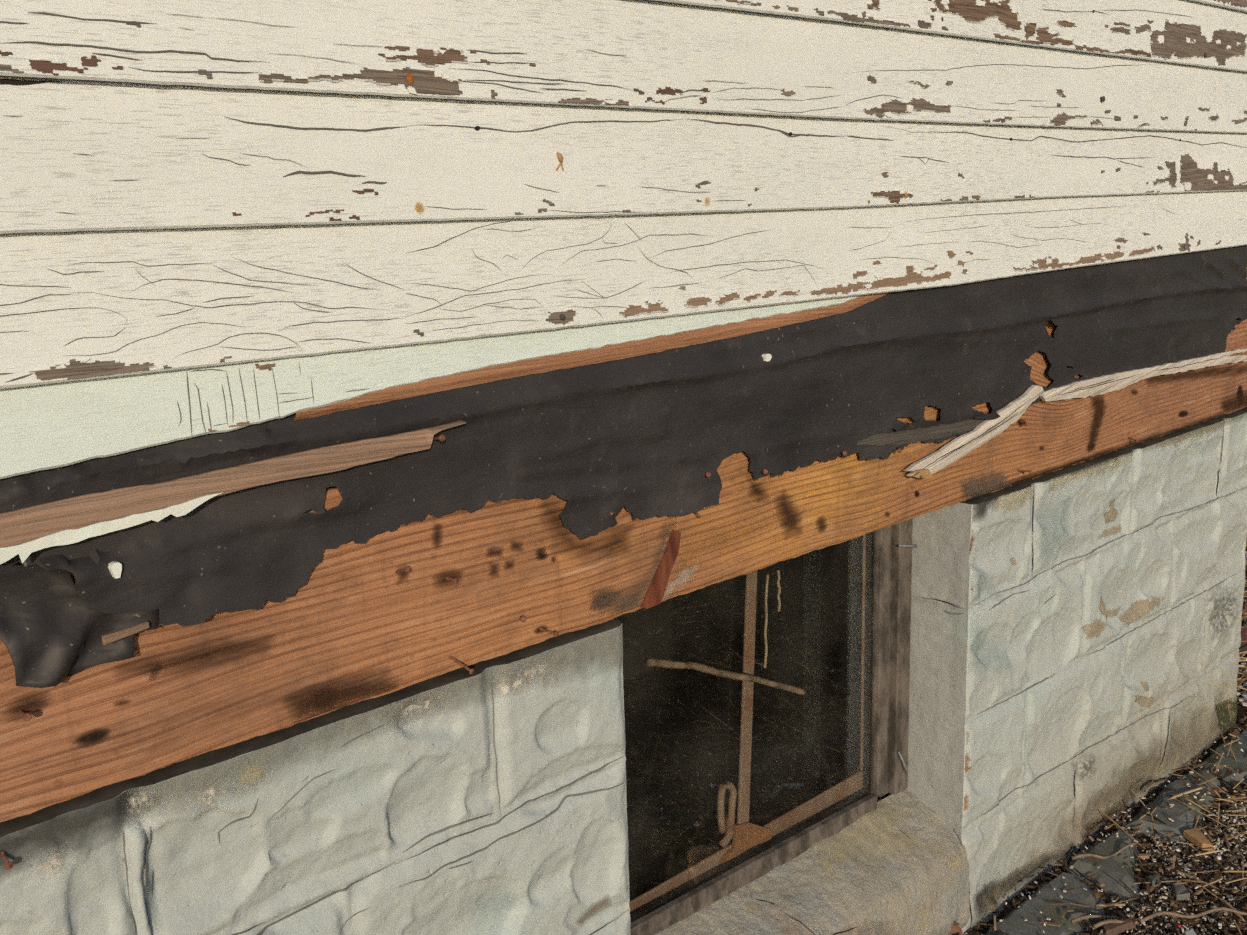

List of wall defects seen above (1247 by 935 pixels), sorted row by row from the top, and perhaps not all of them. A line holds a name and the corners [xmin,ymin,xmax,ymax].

peeling [814,0,1247,66]
peeling [0,50,123,75]
peeling [259,45,490,95]
peeling [1147,153,1247,192]
peeling [679,251,973,308]
crack [0,184,817,436]
peeling [29,358,172,381]
peeling [108,561,122,579]
water stain [139,643,254,673]
water stain [290,679,391,716]
water stain [76,730,108,744]
water stain [0,787,147,872]